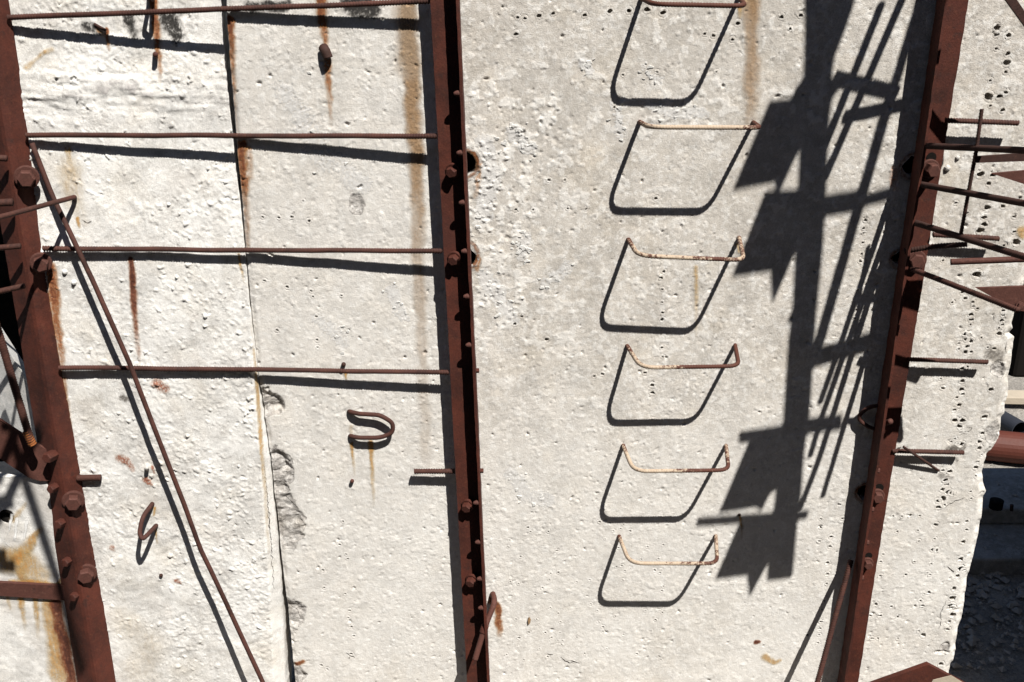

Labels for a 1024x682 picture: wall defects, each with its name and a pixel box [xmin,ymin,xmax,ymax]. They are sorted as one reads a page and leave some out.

corrosion [149,0,162,71]
corrosion [317,0,328,44]
corrosion [324,58,332,97]
corrosion [237,140,251,204]
corrosion [47,263,64,363]
corrosion [128,257,138,335]
spalling [0,80,450,682]
corrosion [0,529,61,584]
corrosion [7,596,77,682]
corrosion [488,597,503,633]